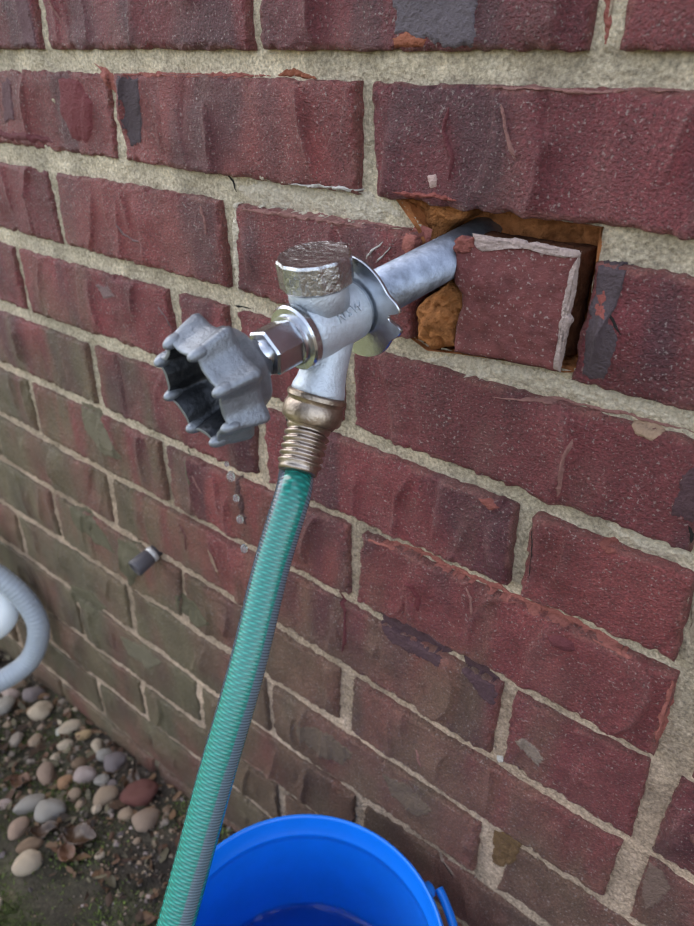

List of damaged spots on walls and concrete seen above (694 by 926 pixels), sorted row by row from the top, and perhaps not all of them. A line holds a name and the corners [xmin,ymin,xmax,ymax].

spalling [416,280,462,350]
spalling [595,291,606,320]